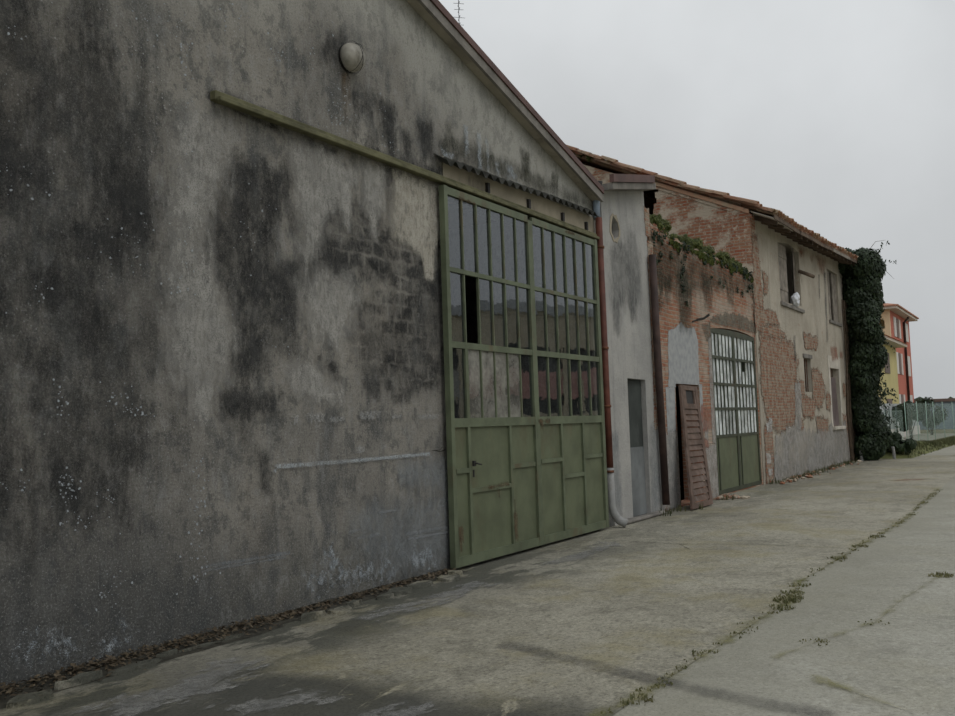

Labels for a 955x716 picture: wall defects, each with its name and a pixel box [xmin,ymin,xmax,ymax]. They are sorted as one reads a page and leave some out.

water stain [0,0,153,513]
water stain [166,74,554,425]
spalling [751,233,850,484]